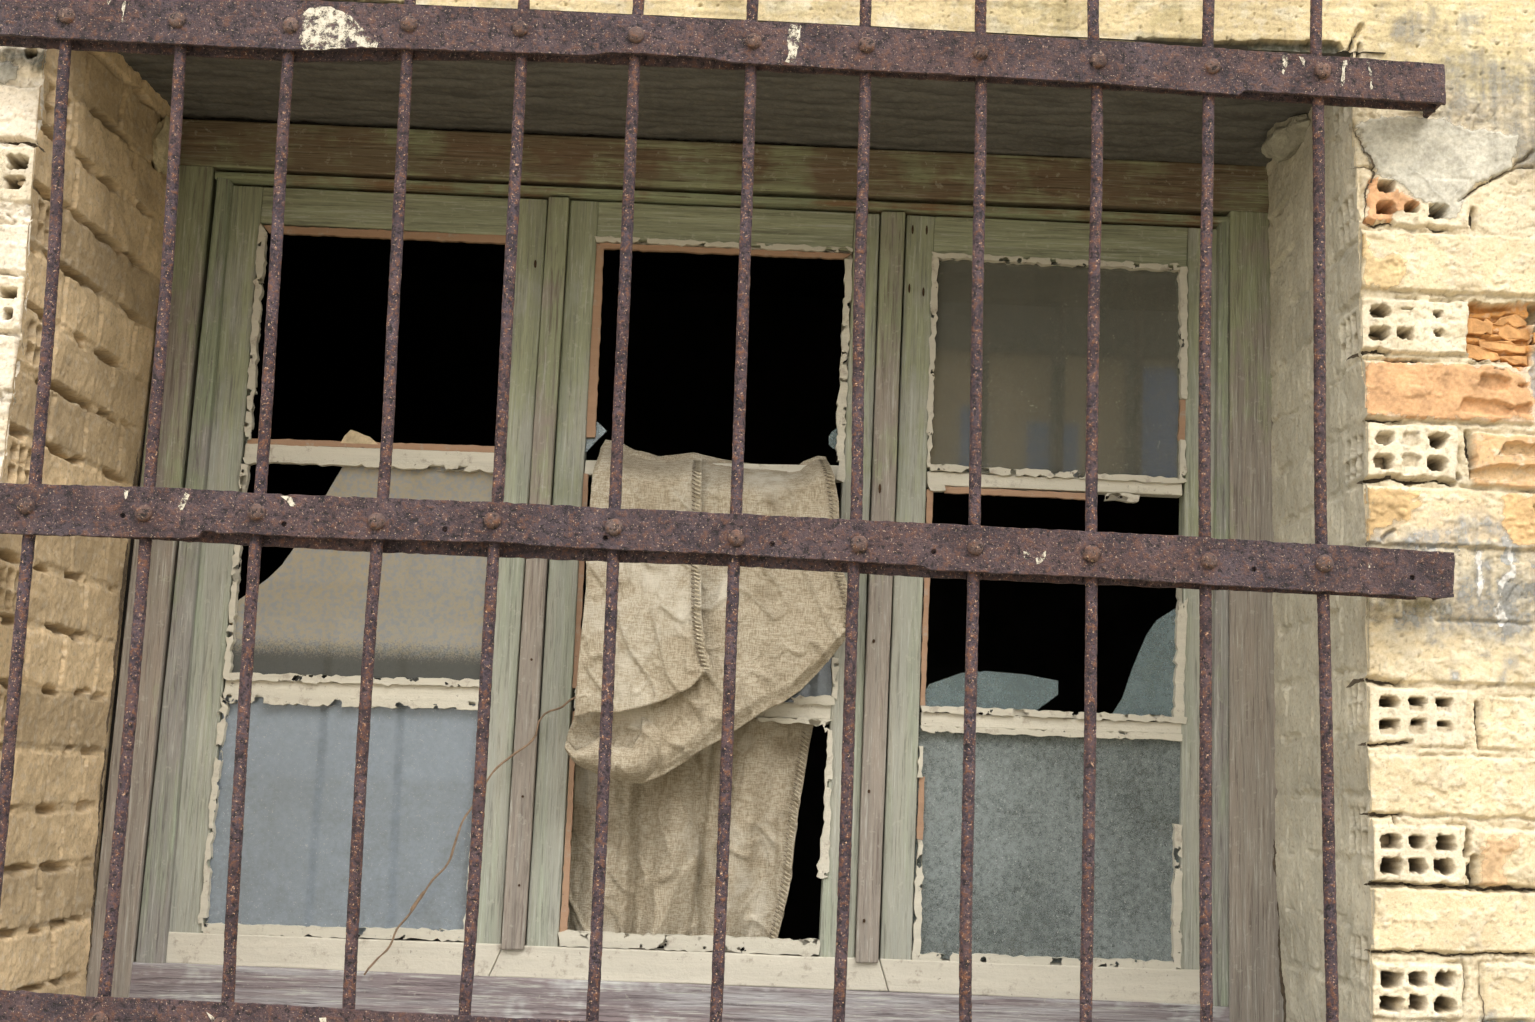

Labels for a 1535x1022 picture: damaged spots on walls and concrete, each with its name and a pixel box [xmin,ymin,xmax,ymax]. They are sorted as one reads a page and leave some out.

peeling [1363,299,1535,422]
peeling [1364,487,1422,544]
spalling [1469,440,1535,545]